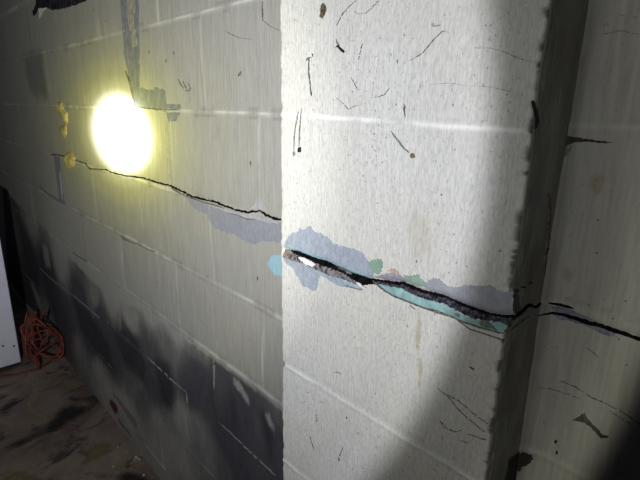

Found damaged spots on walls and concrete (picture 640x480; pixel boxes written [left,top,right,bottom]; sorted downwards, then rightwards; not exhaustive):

crack [410,25,449,61]
peeling [120,0,181,184]
crack [50,154,281,221]
crack [120,236,155,252]
peeling [182,192,516,333]
crack [282,193,640,341]
water stain [3,190,284,480]
crack [438,388,488,443]
crack [538,380,640,425]
spalling [573,413,609,438]